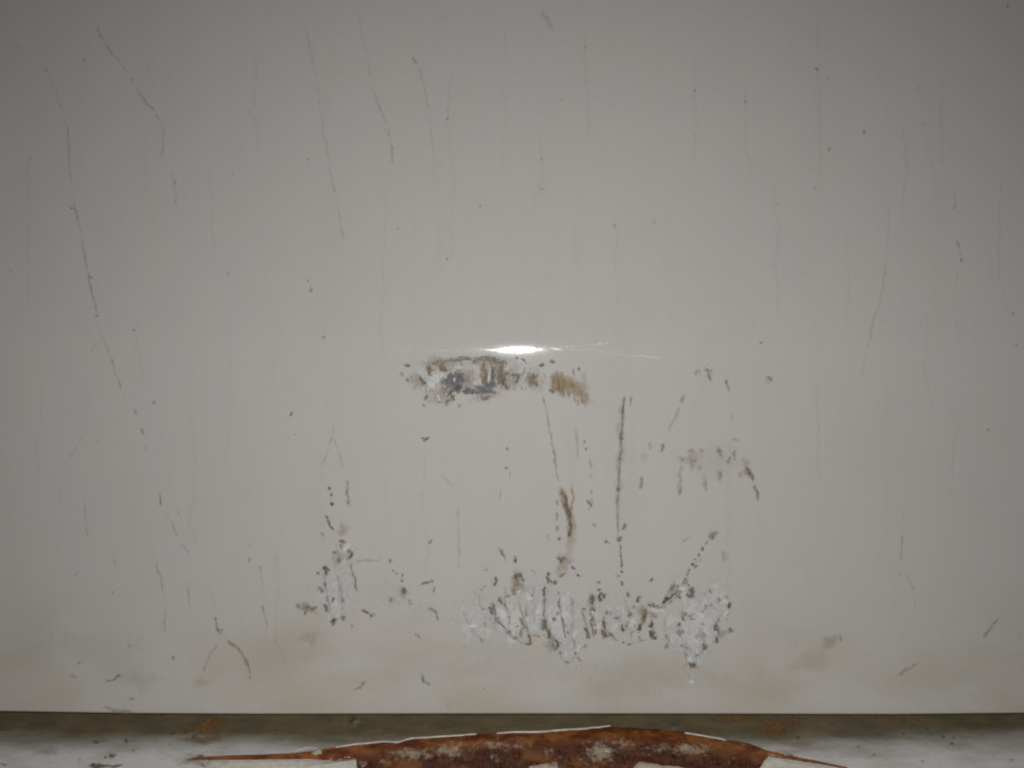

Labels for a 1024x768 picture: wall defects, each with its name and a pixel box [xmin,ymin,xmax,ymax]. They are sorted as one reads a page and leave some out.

peeling [406,356,554,406]
corrosion [562,488,574,536]
peeling [310,540,356,624]
peeling [453,550,732,686]
corrosion [188,725,847,768]